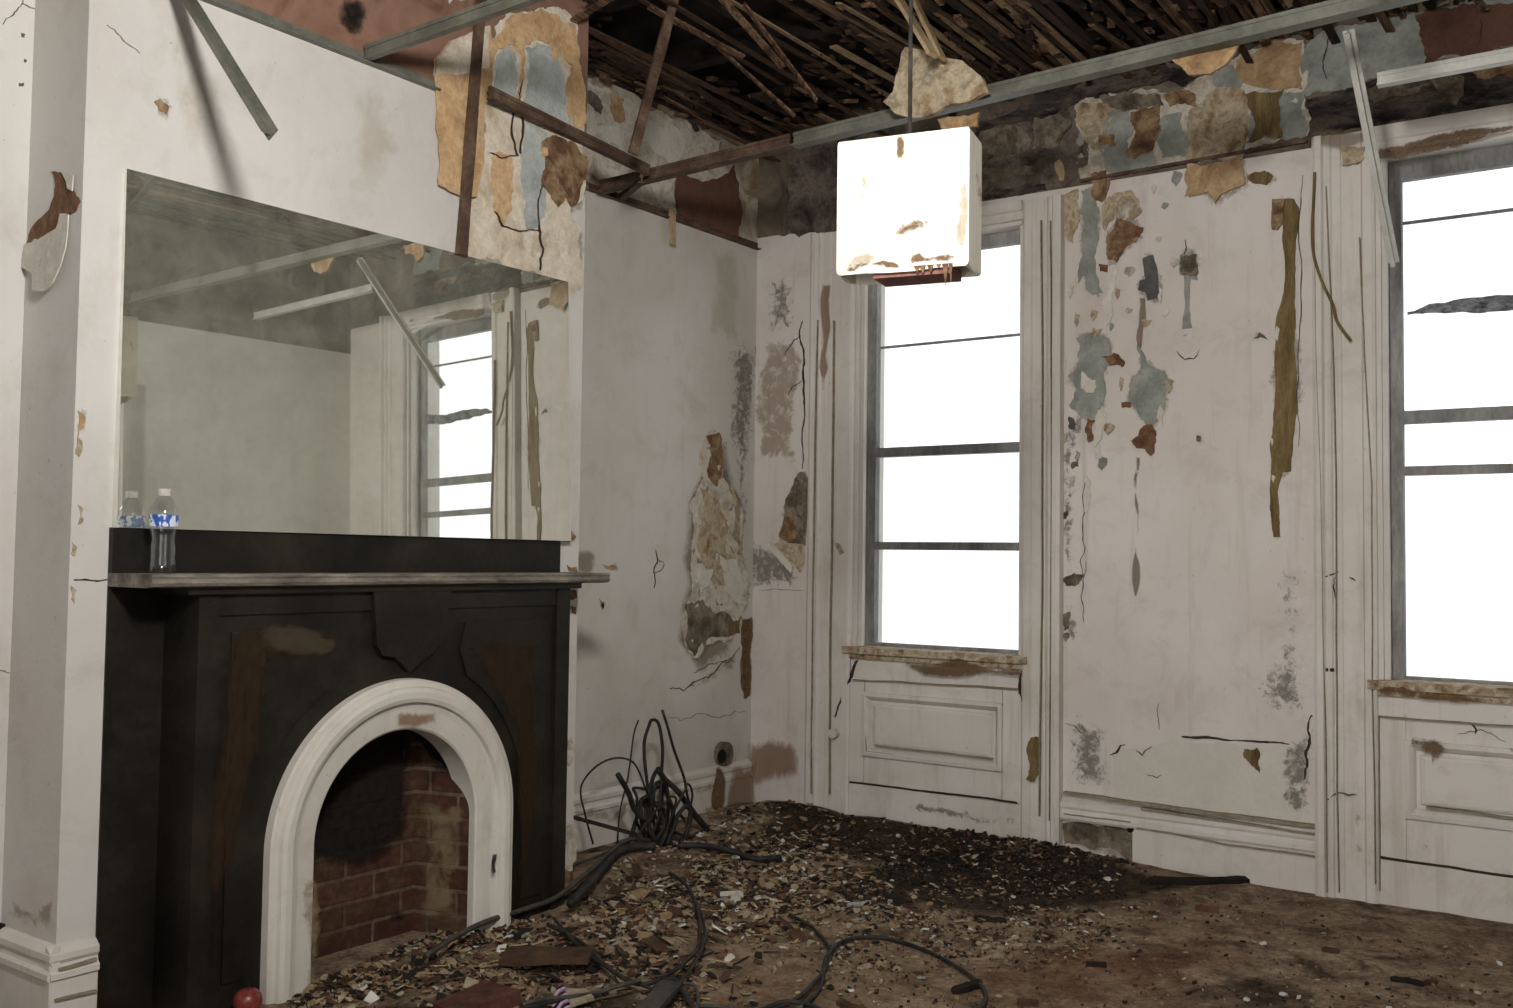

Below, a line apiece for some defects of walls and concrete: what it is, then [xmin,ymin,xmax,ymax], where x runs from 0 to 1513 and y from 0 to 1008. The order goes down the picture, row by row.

flaking render [433,7,743,293]
flaking render [1034,0,1513,642]
flaking render [680,431,750,663]
flaking render [763,472,808,573]